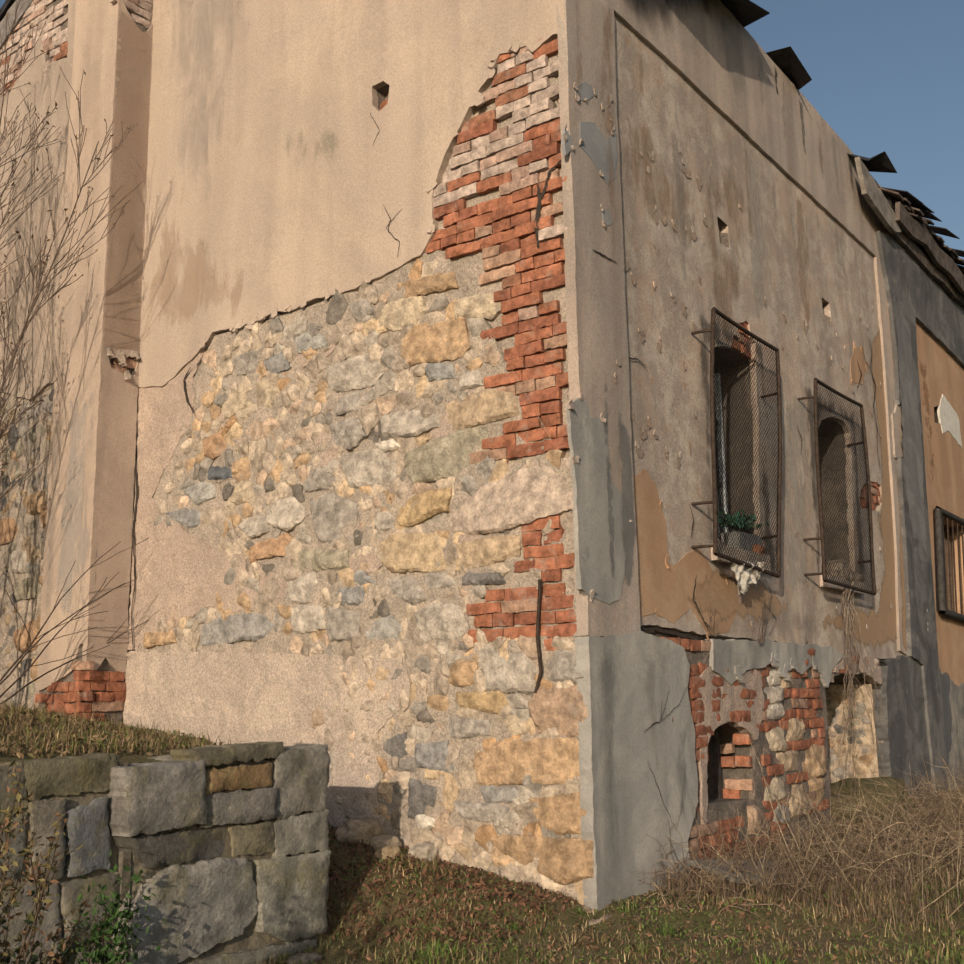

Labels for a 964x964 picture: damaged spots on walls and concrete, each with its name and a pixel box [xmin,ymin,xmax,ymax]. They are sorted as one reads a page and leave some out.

spalling [110,0,153,32]
crack [384,207,402,258]
spalling [0,384,126,726]
crack [130,451,138,648]
spalling [96,37,618,905]
spalling [860,482,882,511]
spalling [656,633,884,882]